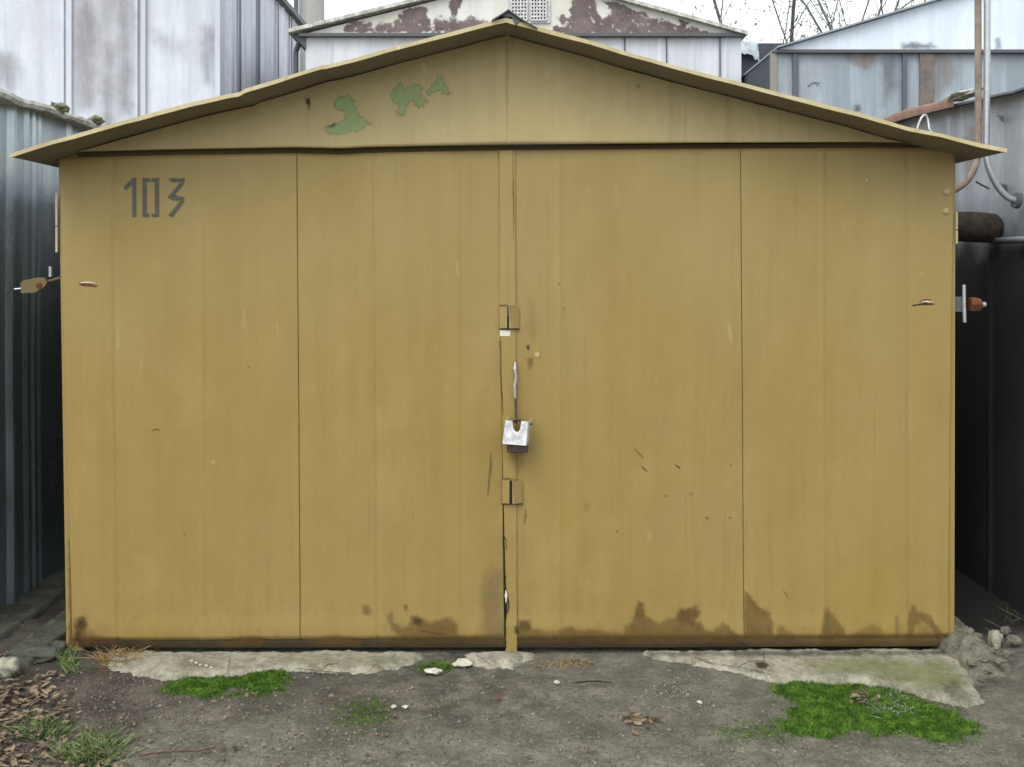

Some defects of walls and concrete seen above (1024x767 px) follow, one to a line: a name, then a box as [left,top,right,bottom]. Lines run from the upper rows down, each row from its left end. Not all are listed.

peeling [344,0,488,33]
peeling [553,0,712,33]
peeling [326,95,370,136]
peeling [390,76,450,116]